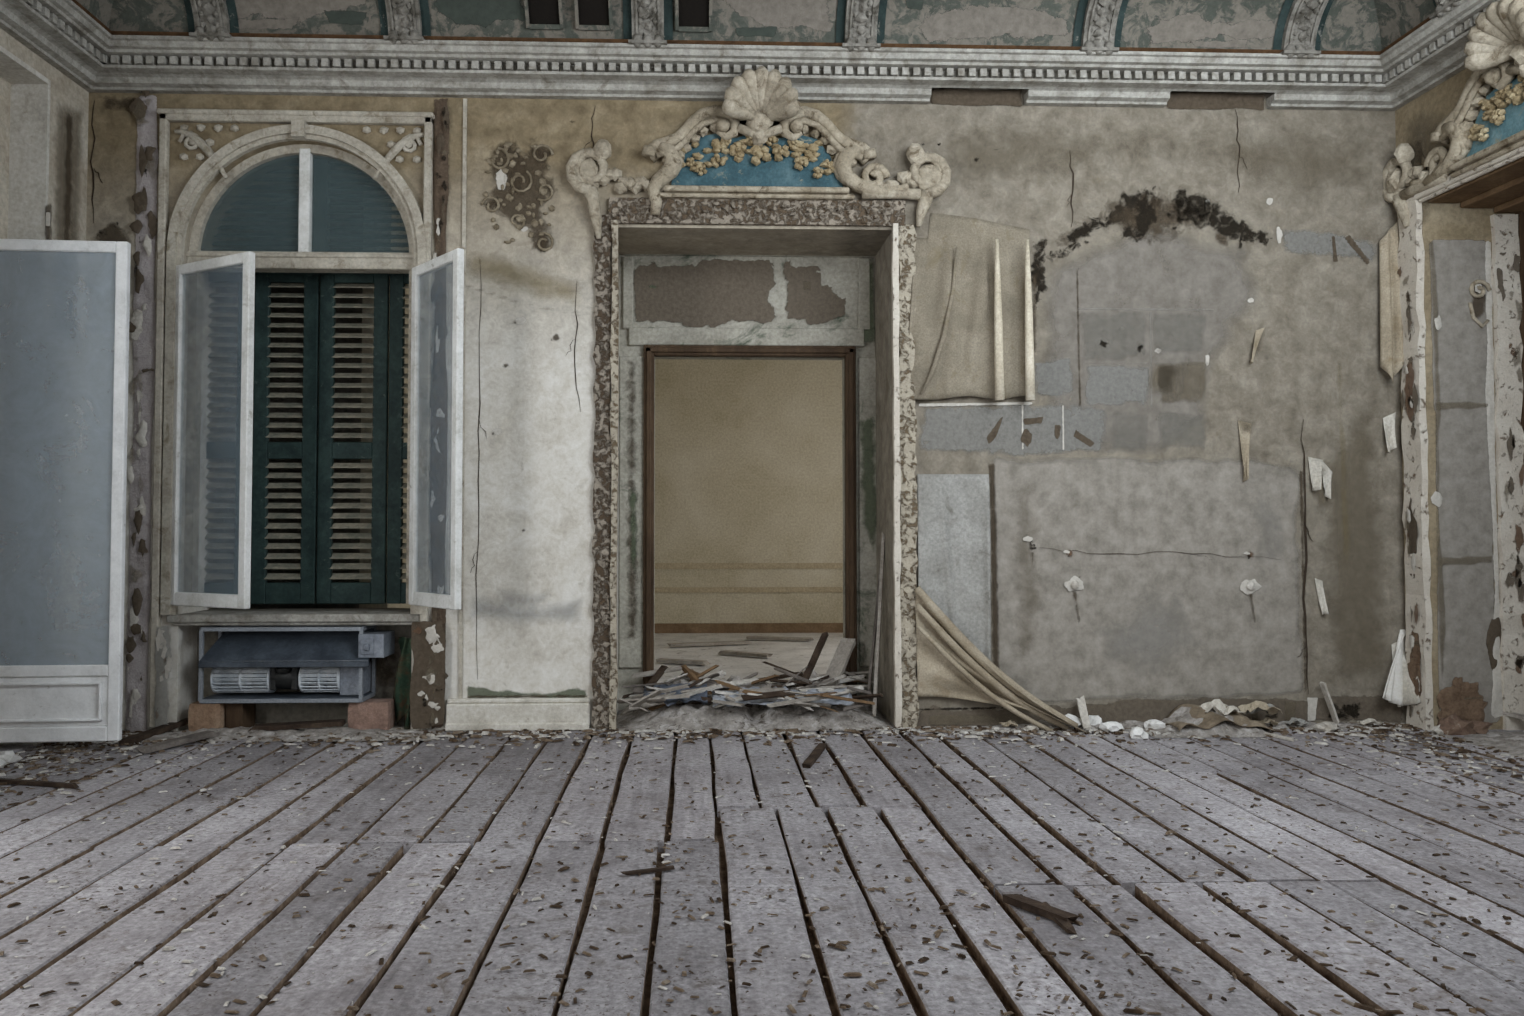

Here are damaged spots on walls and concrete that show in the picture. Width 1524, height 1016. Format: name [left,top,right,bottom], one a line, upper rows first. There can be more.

peeling [235,0,366,30]
peeling [434,0,525,28]
peeling [726,0,834,37]
peeling [905,0,1069,43]
peeling [129,90,150,124]
damp [1031,187,1272,351]
peeling [633,258,846,328]
peeling [409,608,448,729]